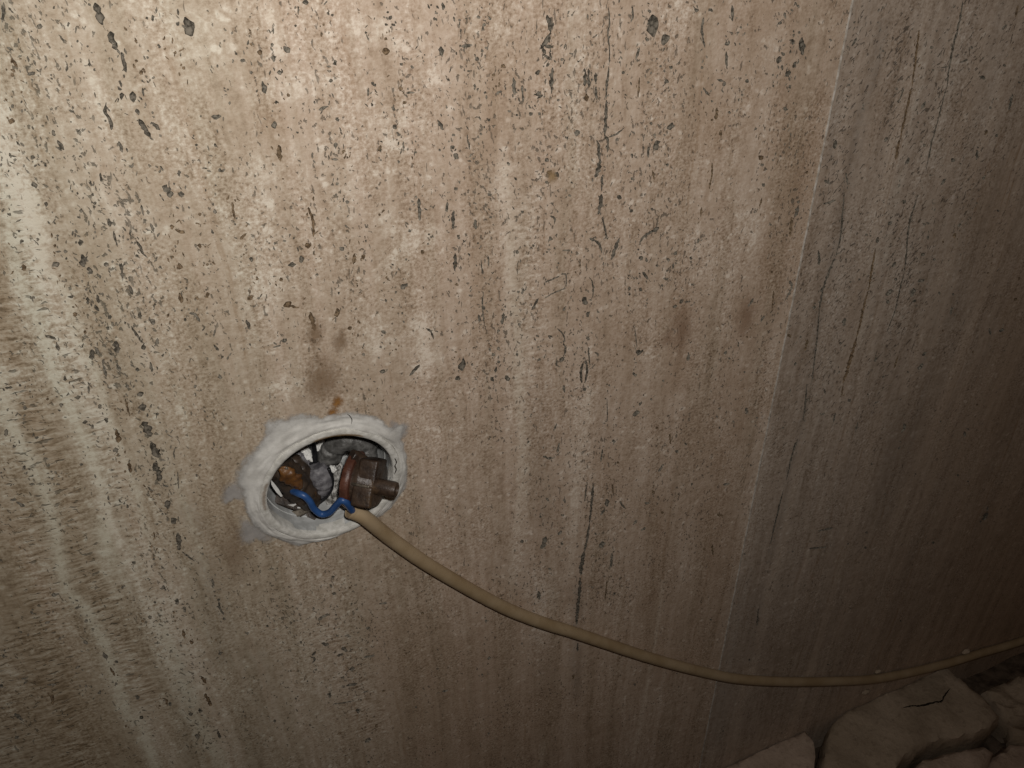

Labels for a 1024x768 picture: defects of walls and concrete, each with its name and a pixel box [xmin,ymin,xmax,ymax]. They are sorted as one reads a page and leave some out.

crack [594,7,625,239]
crack [575,483,594,652]